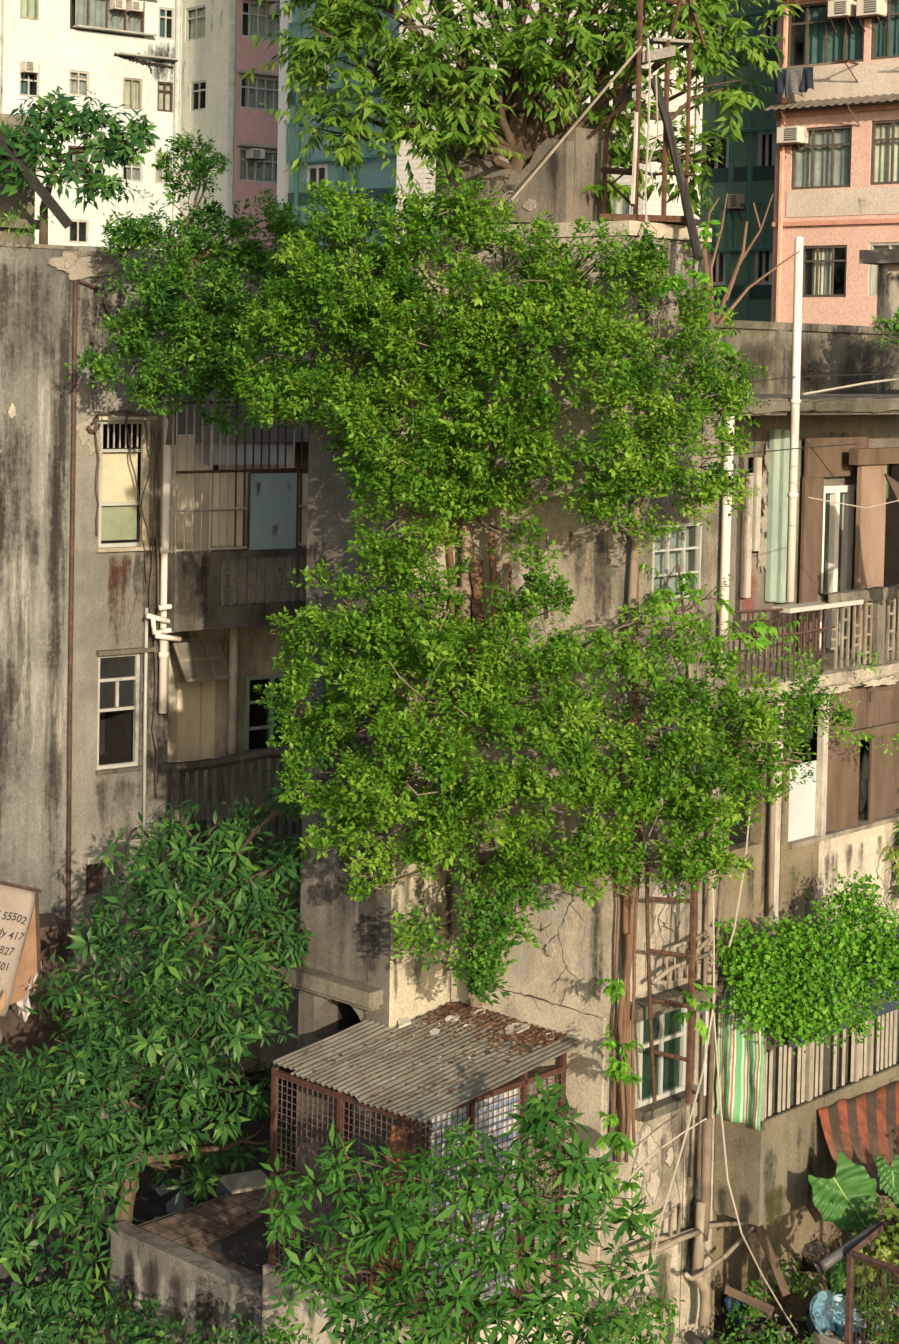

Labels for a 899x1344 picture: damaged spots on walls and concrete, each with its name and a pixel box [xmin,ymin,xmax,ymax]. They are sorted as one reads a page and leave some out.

flaking render [47,251,122,281]
flaking render [8,401,17,419]
damp [0,265,122,814]
corrosion [110,558,131,606]
crack [487,879,601,1019]